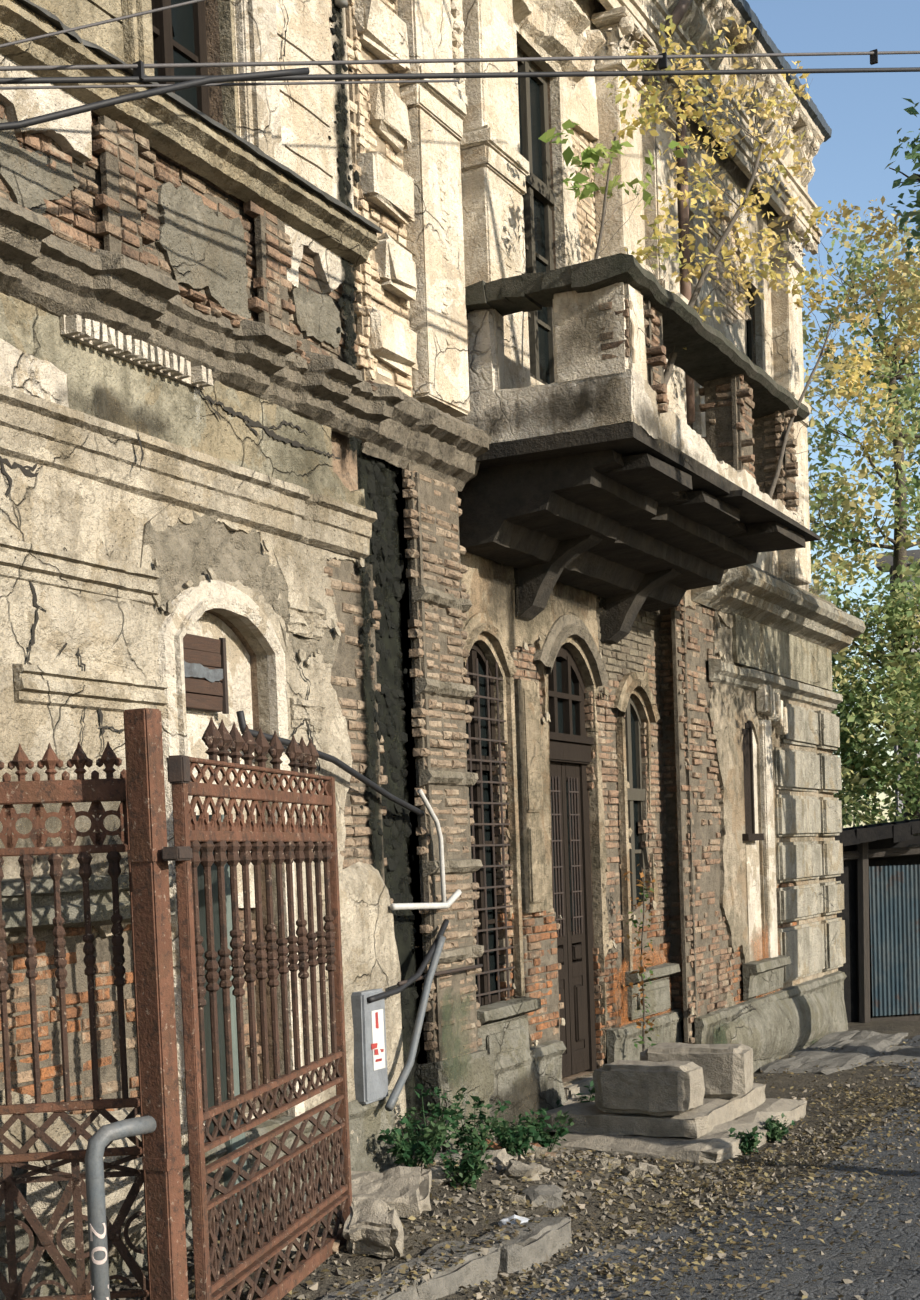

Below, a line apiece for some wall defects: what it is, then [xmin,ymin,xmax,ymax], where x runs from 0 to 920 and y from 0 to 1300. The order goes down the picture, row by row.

water stain [333,2,352,207]
flaking render [15,111,104,250]
flaking render [138,146,259,322]
flaking render [288,252,358,367]
water stain [341,257,357,370]
crack [0,456,39,497]
crack [186,383,341,459]
crack [27,581,86,671]
crack [73,706,124,752]
crack [292,657,320,820]
water stain [350,436,416,1053]
water stain [404,1072,419,1153]